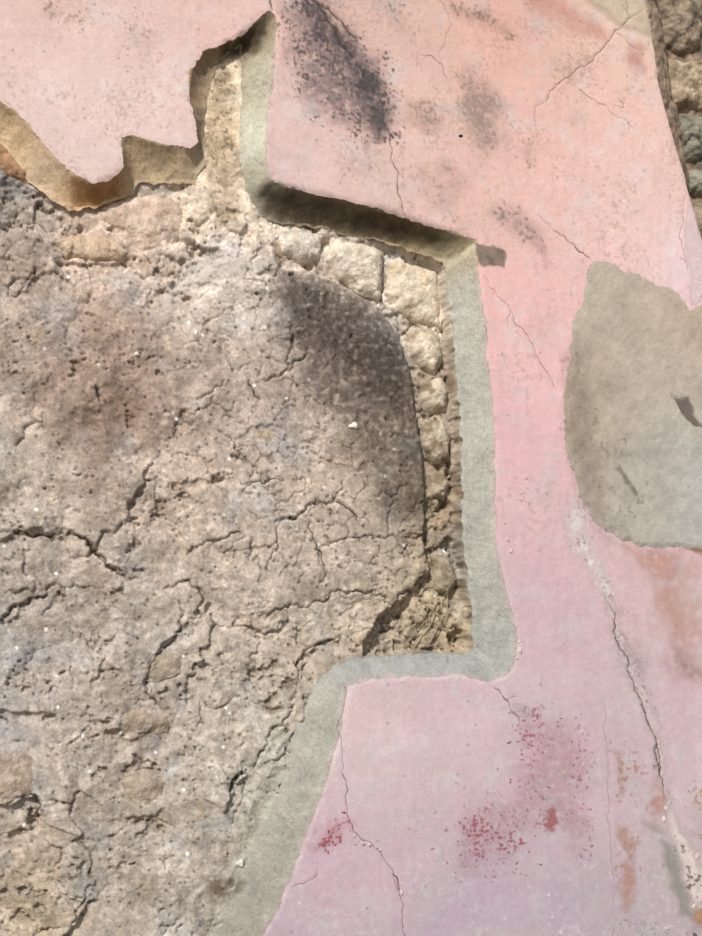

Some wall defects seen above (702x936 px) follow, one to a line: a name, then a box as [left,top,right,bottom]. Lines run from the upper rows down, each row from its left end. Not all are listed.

water stain [224,25,266,56]
water stain [277,0,405,145]
water stain [165,254,264,309]
flaking render [0,11,517,936]
water stain [290,287,421,511]
flaking render [563,261,702,620]
crack [0,530,134,581]
crack [190,488,426,613]
crack [146,580,204,710]
crack [230,636,339,795]
peeling [455,811,537,876]
peeling [523,783,591,830]